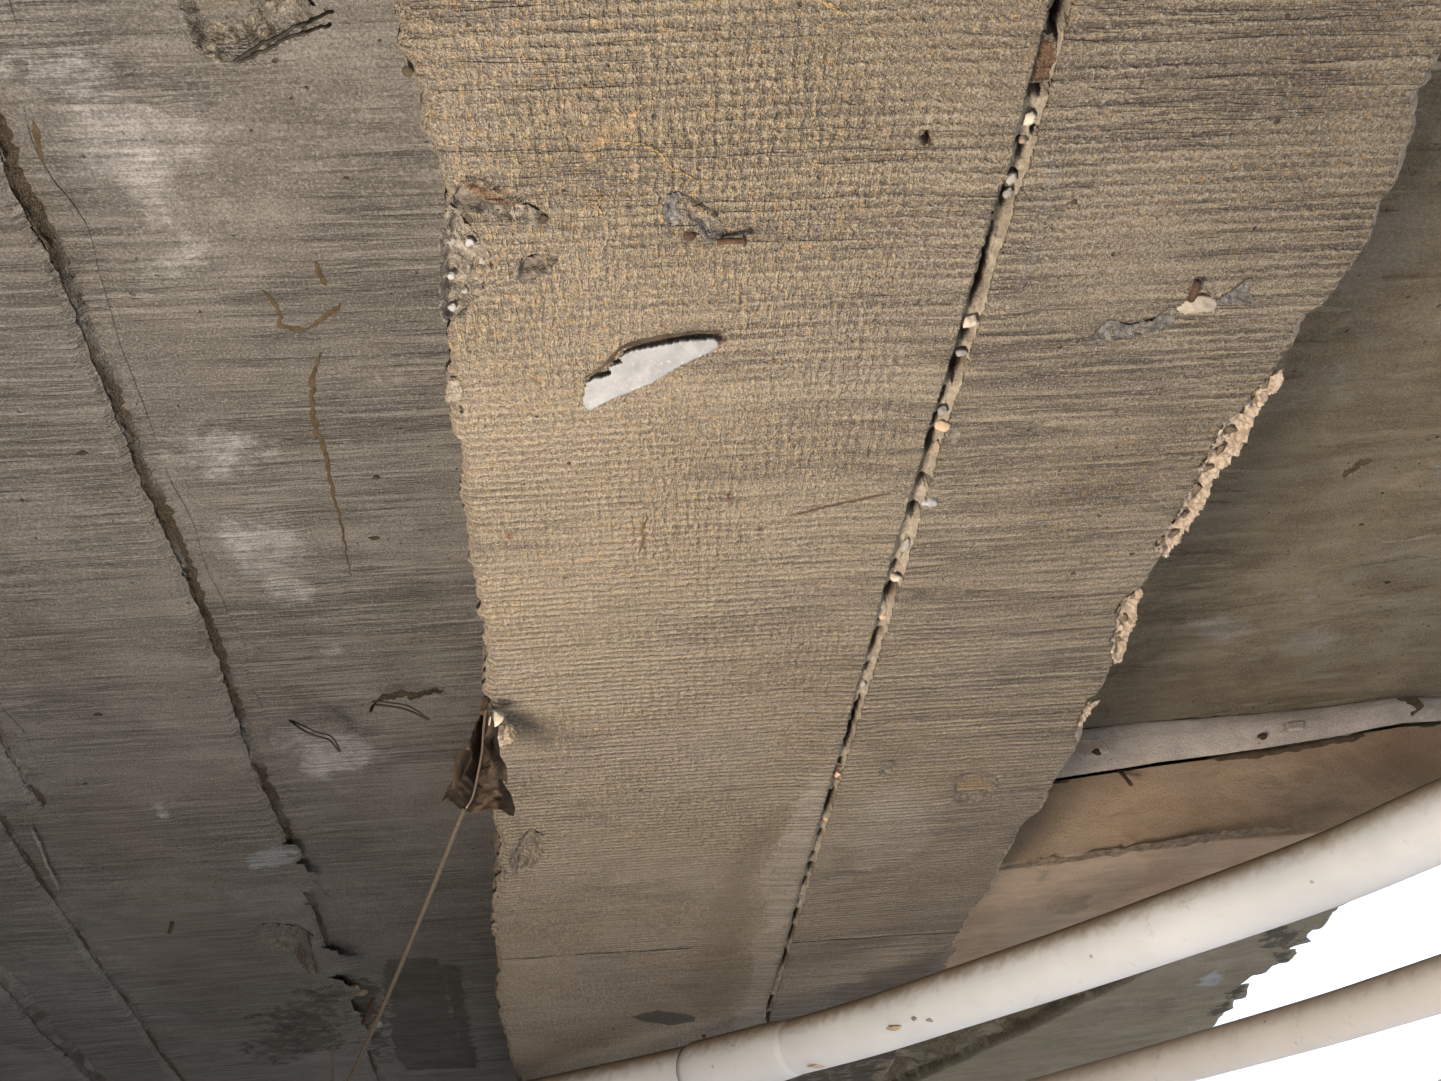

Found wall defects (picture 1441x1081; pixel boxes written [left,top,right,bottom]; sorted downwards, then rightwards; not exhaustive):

spalling [170,0,318,64]
crack [32,121,46,168]
spalling [438,174,549,322]
spalling [513,253,556,286]
peeling [583,327,730,411]
crack [261,262,352,576]
spalling [1154,369,1284,558]
crack [761,0,1072,1024]
spalling [1110,587,1143,664]
spalling [498,724,517,747]
spalling [1077,700,1100,729]
spalling [1397,698,1424,716]